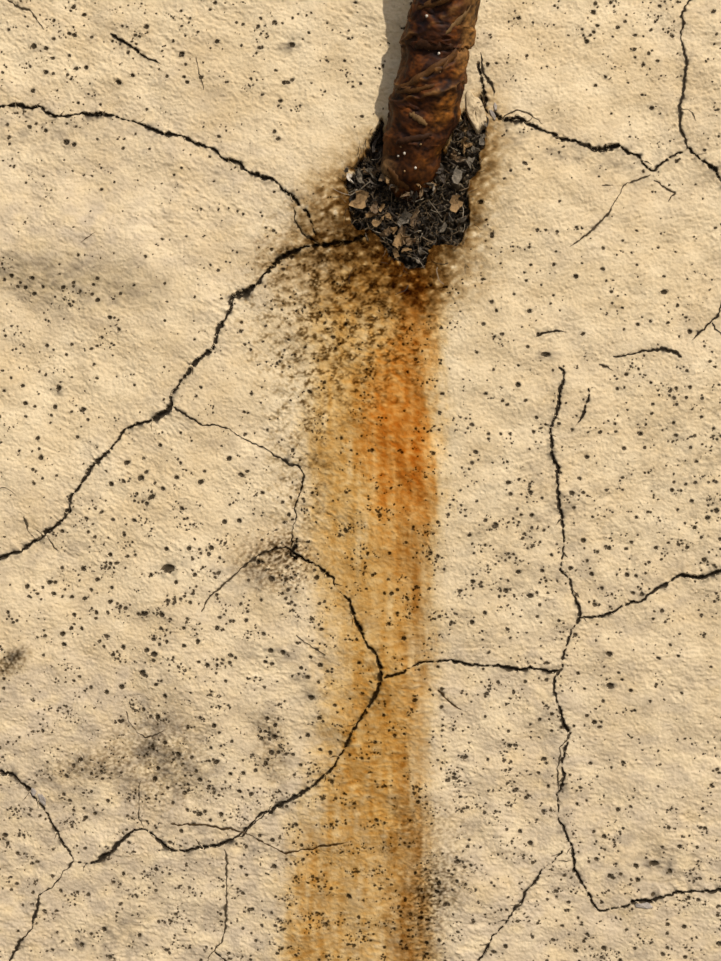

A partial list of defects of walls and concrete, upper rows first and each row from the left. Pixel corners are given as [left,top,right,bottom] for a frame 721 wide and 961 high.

crack [8,0,44,29]
crack [110,33,158,63]
crack [0,102,315,238]
spalling [333,90,489,284]
crack [476,0,721,246]
crack [0,240,721,961]